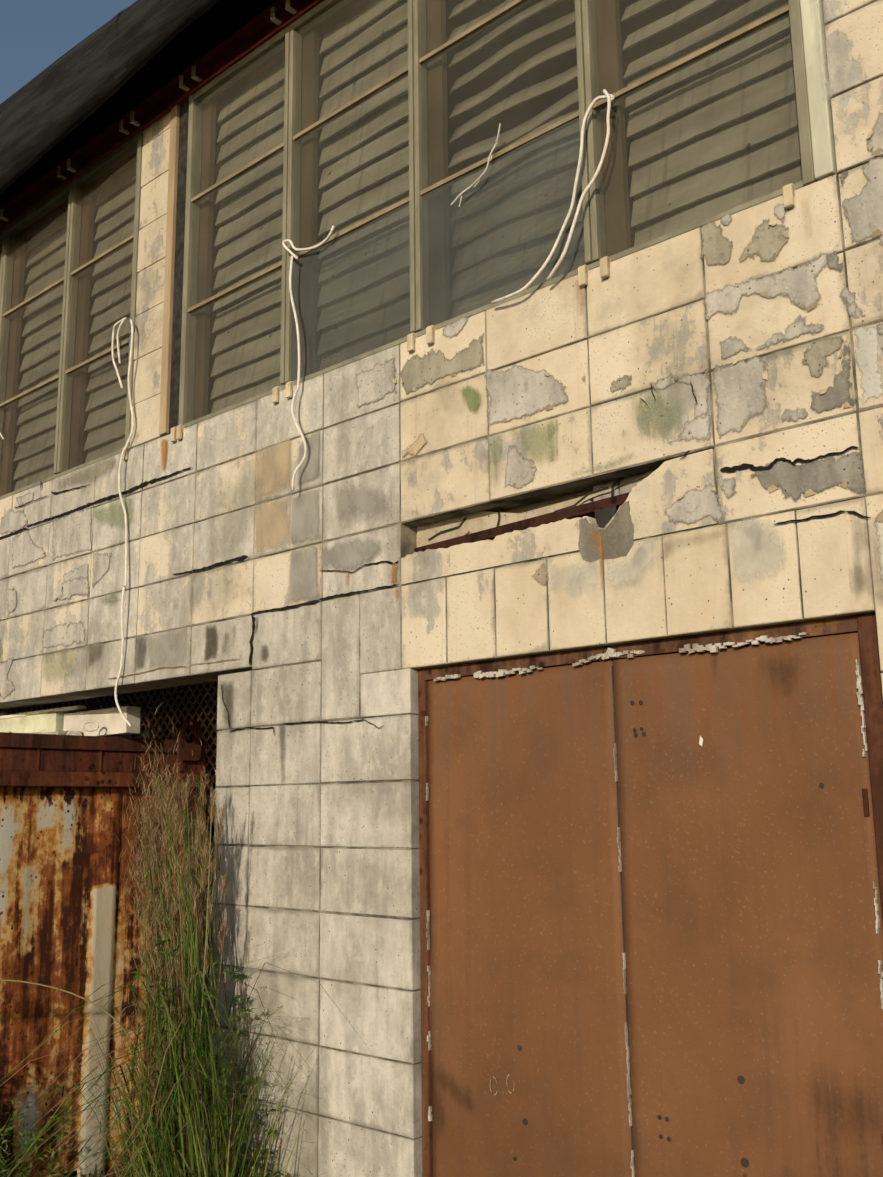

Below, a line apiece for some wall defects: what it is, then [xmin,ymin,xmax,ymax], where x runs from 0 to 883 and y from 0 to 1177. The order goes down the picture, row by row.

peeling [839,114,883,243]
peeling [442,313,471,338]
peeling [652,204,856,444]
peeling [840,287,865,318]
peeling [356,334,568,425]
peeling [610,375,632,392]
peeling [505,445,537,489]
crack [720,446,859,472]
peeling [751,450,866,502]
spalling [578,501,634,562]